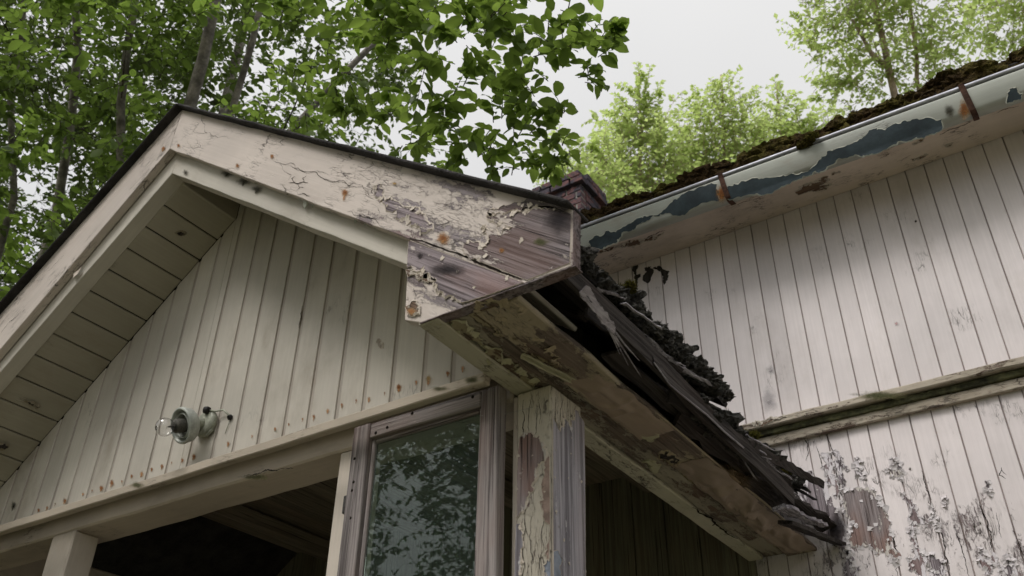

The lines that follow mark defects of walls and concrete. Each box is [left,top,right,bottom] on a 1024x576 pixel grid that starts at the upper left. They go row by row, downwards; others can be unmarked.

peeling [589,117,944,254]
crack [409,238,525,280]
peeling [372,184,576,388]
peeling [514,409,586,576]
peeling [798,449,950,576]
peeling [982,480,995,498]
peeling [975,546,1019,576]